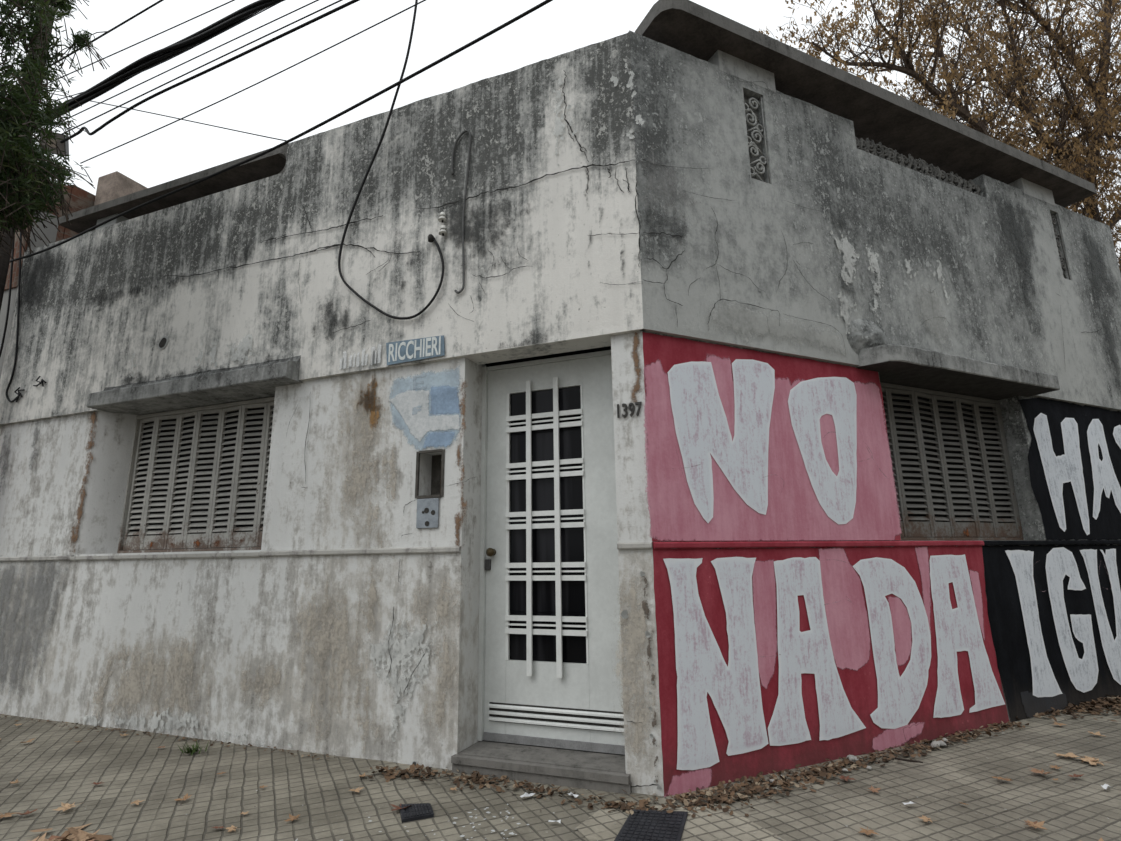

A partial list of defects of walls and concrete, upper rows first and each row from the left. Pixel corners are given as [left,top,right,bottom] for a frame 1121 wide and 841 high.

damp [92,286,141,306]
crack [161,205,413,301]
damp [313,301,348,338]
damp [446,200,510,267]
crack [418,70,846,355]
peeling [830,231,884,335]
damp [995,199,1040,335]
corrosion [356,379,380,428]
damp [0,554,67,690]
damp [297,569,378,739]